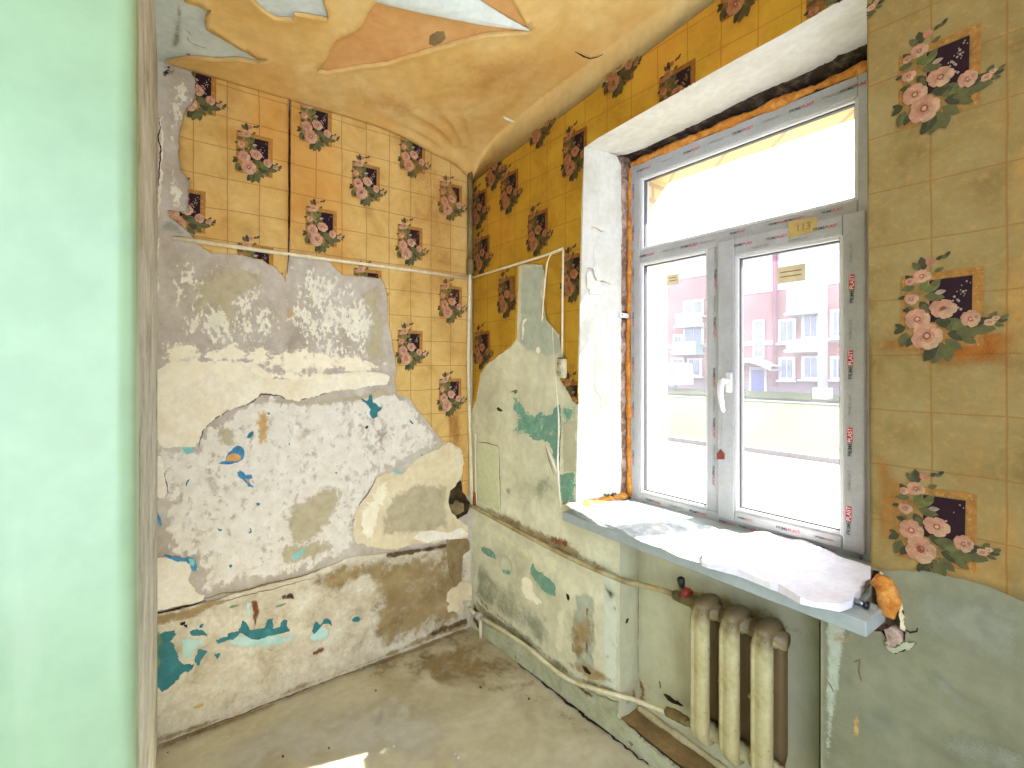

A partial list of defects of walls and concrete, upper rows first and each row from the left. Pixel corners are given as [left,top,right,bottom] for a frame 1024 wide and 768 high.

flaking render [157,254,680,768]
water stain [310,542,600,735]
peeling [823,623,862,757]
spalling [871,570,883,605]
spalling [874,605,918,654]